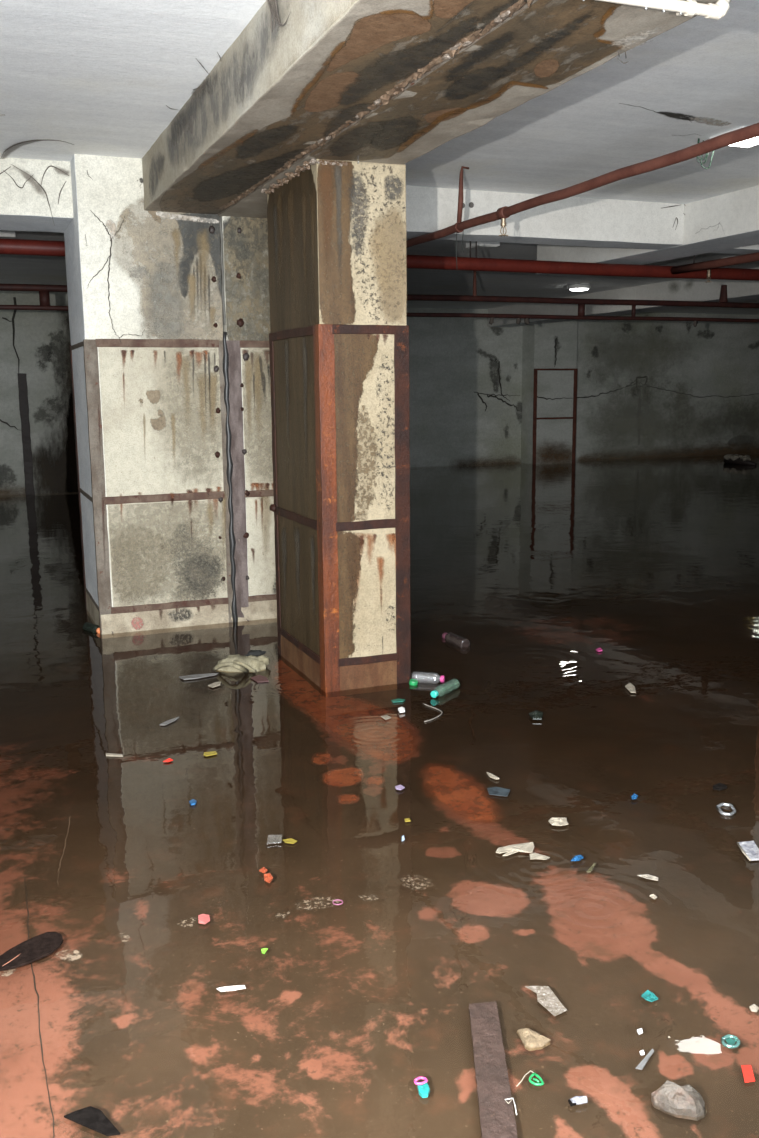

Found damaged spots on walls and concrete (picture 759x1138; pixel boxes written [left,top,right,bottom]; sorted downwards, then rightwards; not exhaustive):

crack [85,211,145,342]
damp [109,0,658,656]
rust [154,350,216,419]
rust [243,350,270,406]
rust [317,159,397,659]
damp [537,402,759,464]
rust [188,487,225,525]